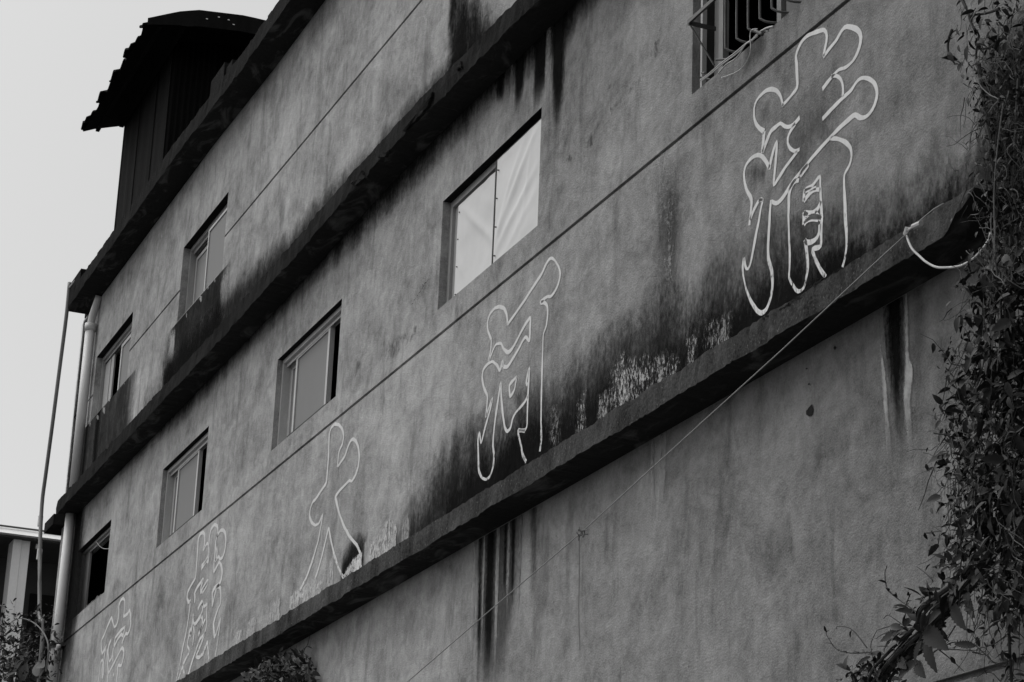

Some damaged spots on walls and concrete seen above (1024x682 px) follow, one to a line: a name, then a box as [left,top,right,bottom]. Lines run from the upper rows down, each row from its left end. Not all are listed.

leakage [132,0,587,459]
leakage [233,42,1024,657]